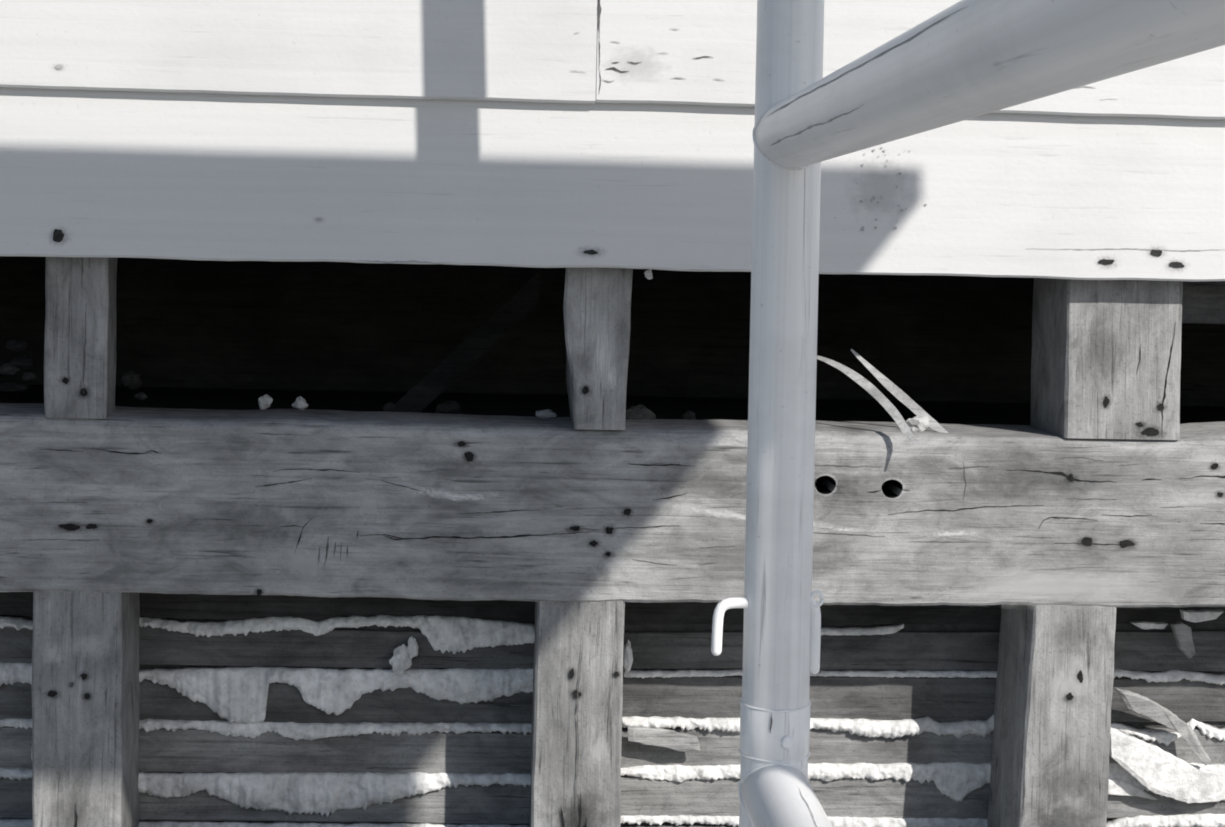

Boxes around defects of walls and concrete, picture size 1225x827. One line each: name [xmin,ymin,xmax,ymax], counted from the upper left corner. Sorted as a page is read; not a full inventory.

crack [595,0,603,92]
crack [559,619,600,827]